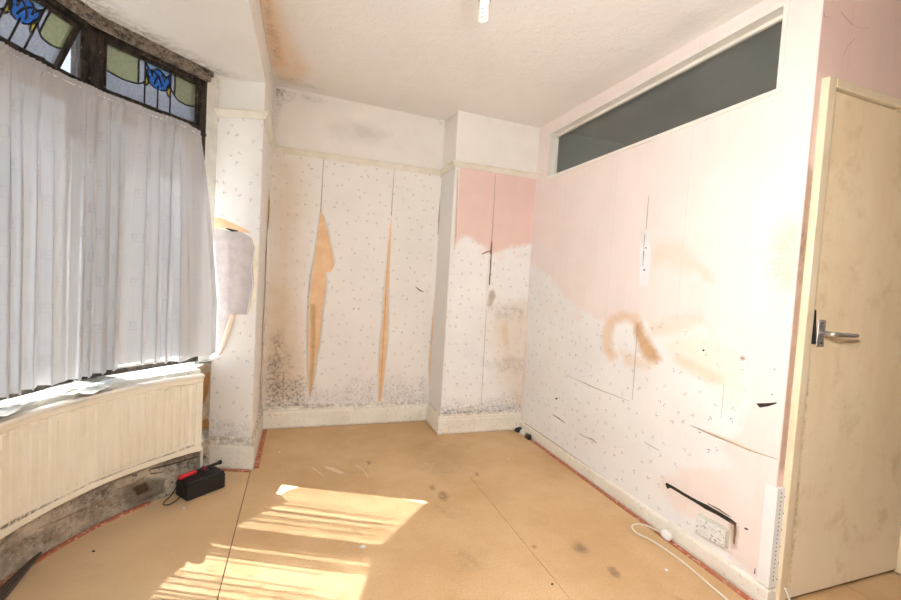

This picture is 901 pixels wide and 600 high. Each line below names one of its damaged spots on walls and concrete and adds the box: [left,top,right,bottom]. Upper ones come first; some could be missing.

water stain [0,0,429,581]
water stain [399,433,482,524]
water stain [441,277,529,414]
peeling [442,226,772,580]
water stain [596,152,815,483]